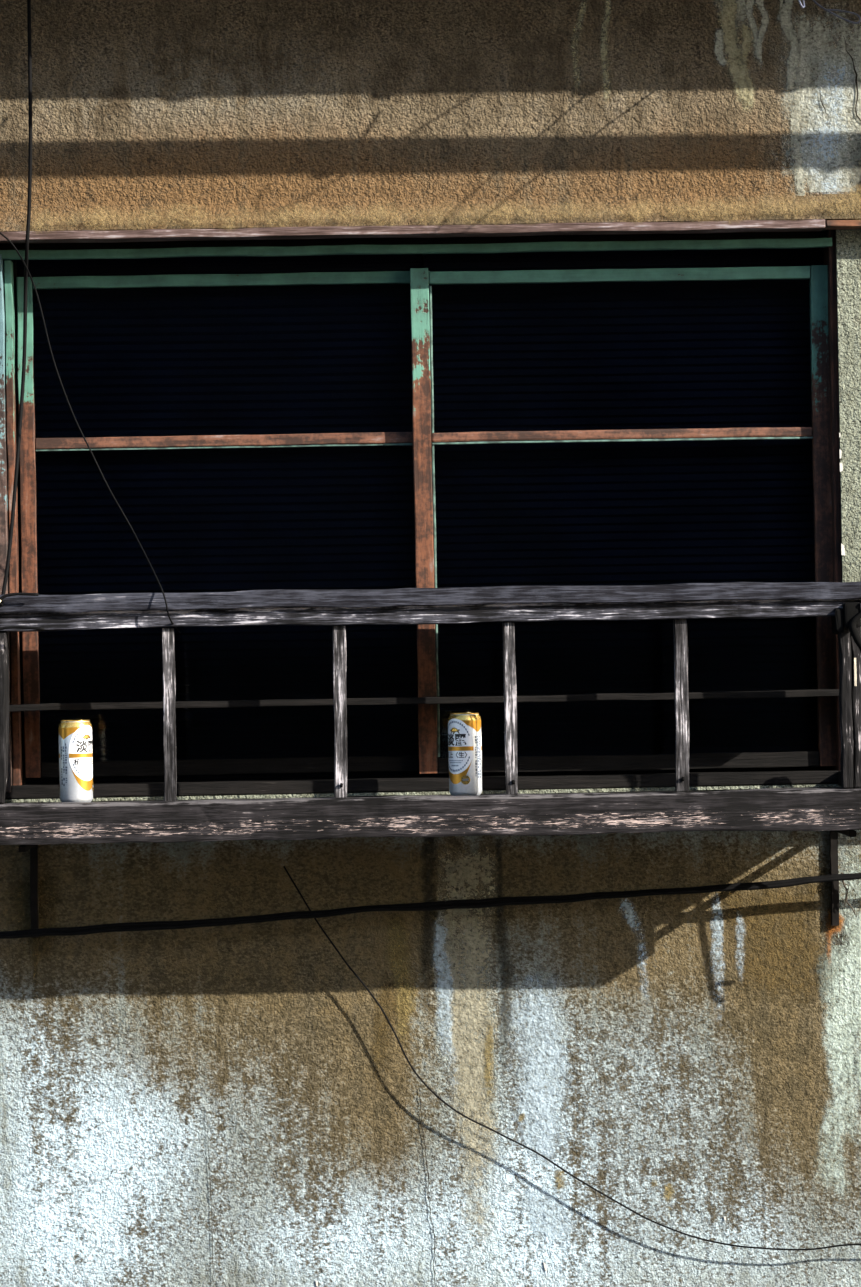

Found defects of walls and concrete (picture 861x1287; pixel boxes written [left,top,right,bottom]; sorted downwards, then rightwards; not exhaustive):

water stain [600,0,612,97]
water stain [714,0,861,196]
crack [819,36,861,121]
water stain [620,899,644,966]
water stain [713,899,722,1006]
water stain [422,837,567,1225]
water stain [817,859,861,1191]